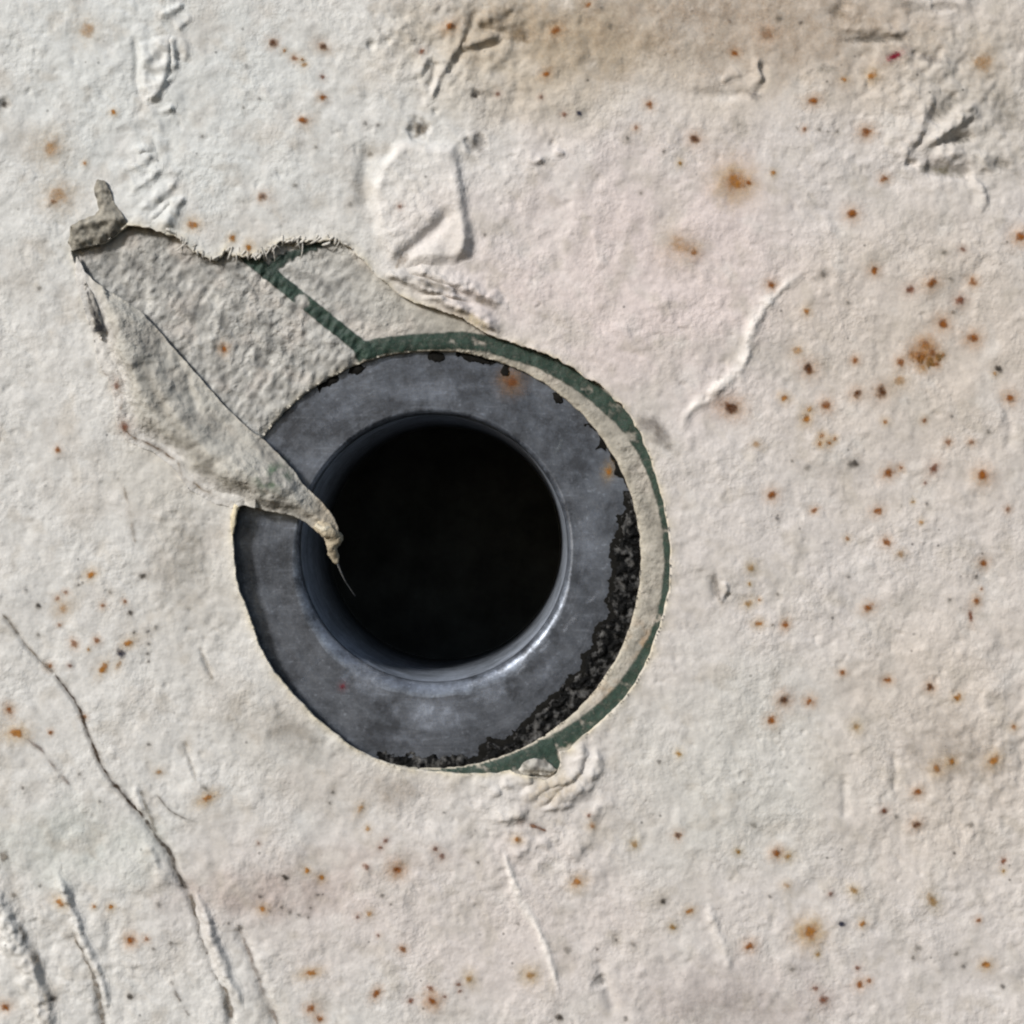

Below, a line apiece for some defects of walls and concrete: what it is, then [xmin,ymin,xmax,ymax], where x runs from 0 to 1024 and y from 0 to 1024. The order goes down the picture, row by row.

rust [897,341,945,383]
rust [724,402,737,414]
peeling [68,179,670,862]
crack [3,615,260,1024]
rust [801,924,818,940]